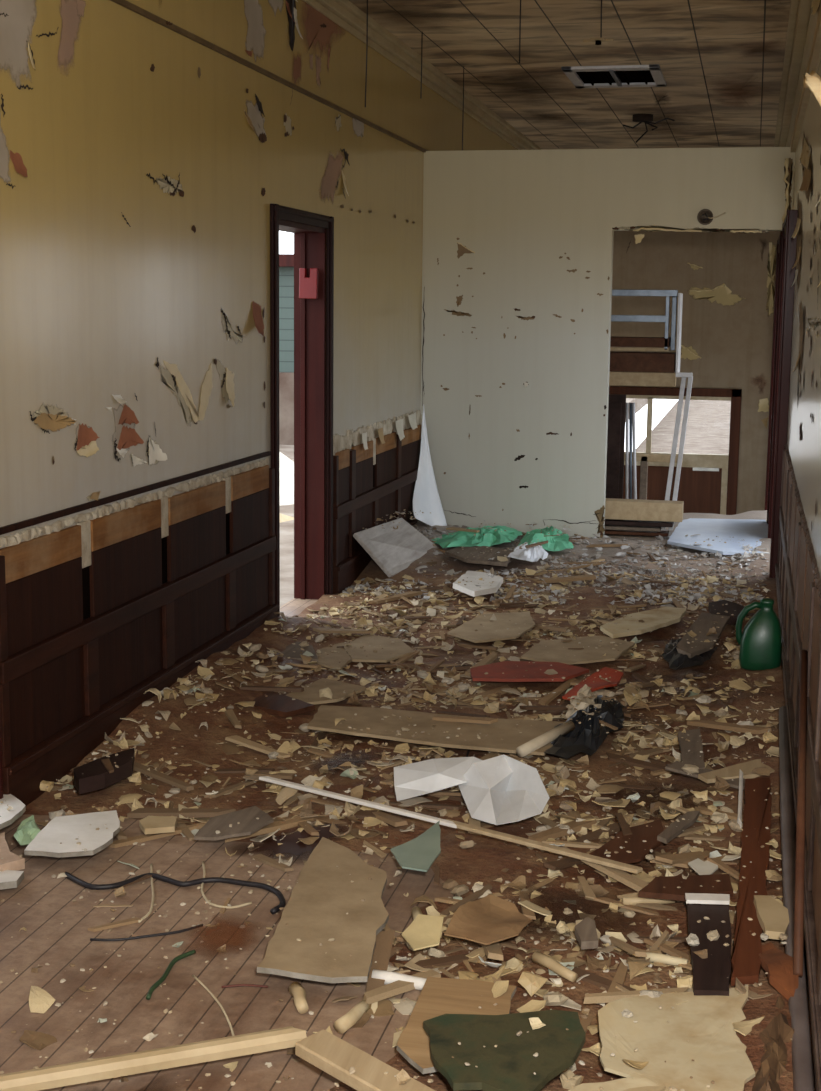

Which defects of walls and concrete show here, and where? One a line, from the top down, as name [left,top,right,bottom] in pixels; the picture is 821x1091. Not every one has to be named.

peeling [0,0,86,90]
peeling [244,0,303,62]
damp [293,3,342,86]
peeling [0,94,28,189]
peeling [244,89,267,143]
spalling [612,225,772,269]
peeling [782,132,821,408]
peeling [221,310,244,344]
peeling [252,301,265,343]
peeling [156,357,235,424]
peeling [30,395,167,466]
peeling [345,412,418,450]